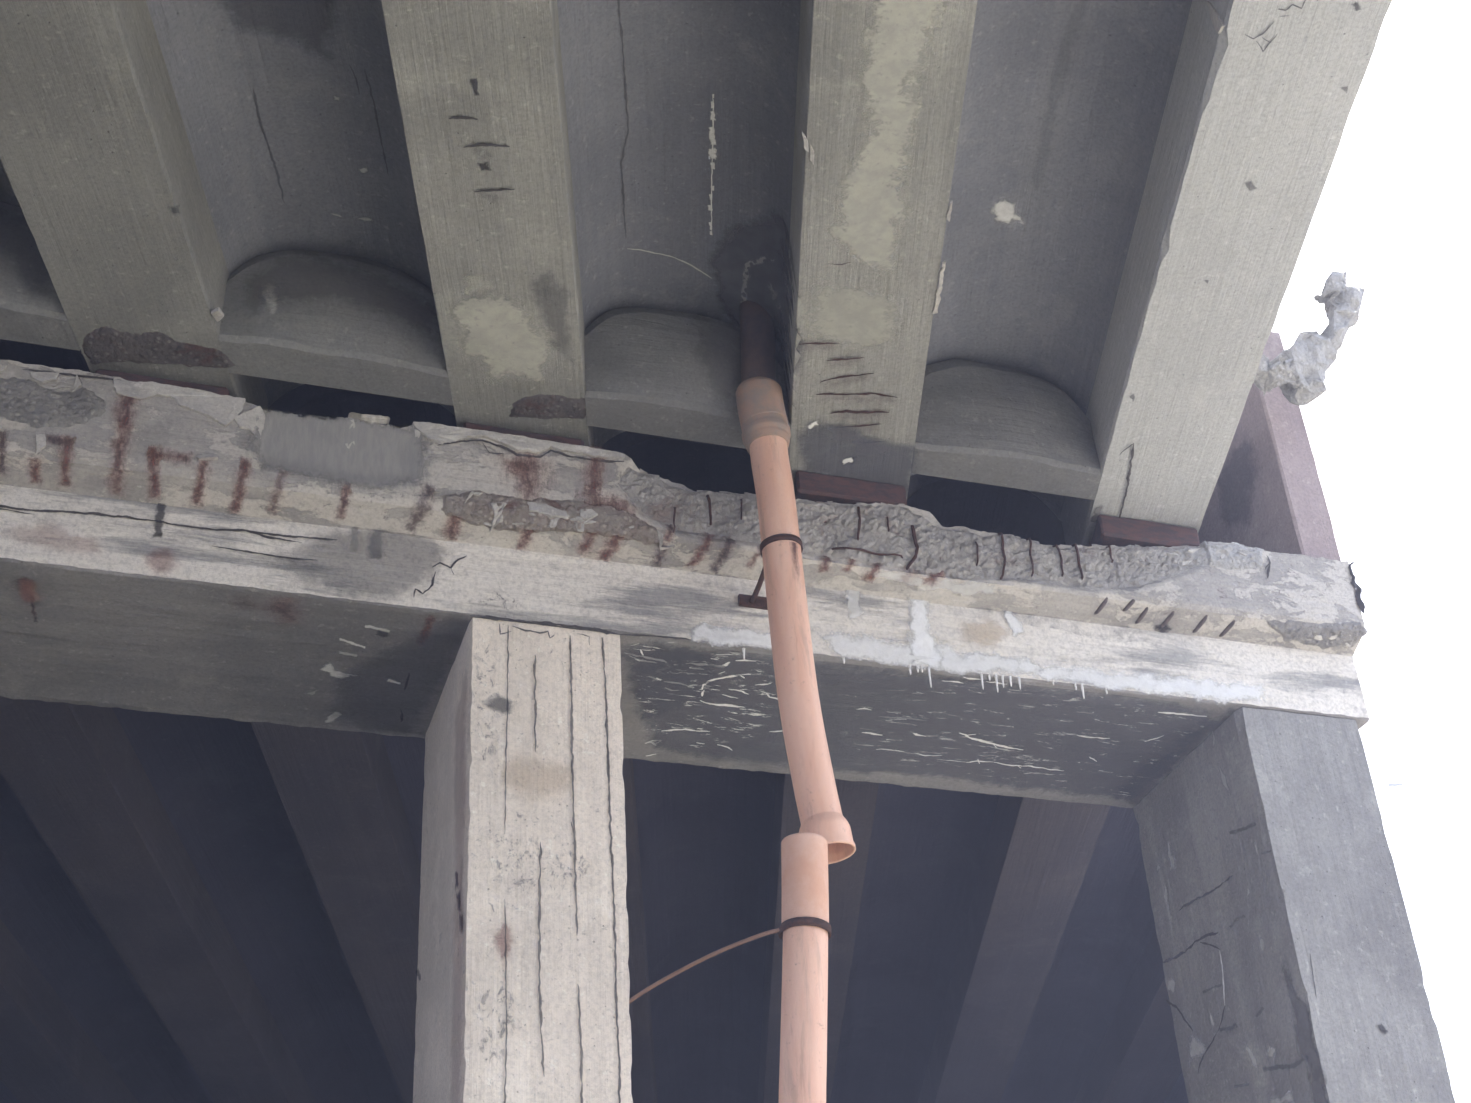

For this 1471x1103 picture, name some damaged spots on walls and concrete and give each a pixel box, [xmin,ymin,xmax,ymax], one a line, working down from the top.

leakage [828,0,946,272]
leakage [708,94,897,405]
corrosion [108,395,134,494]
crack [0,505,337,560]
corrosion [147,447,210,505]
corrosion [230,459,250,512]
peeling [0,326,761,551]
crack [799,342,897,442]
spalling [796,499,1264,624]
leakage [626,623,788,762]
leakage [814,599,1264,804]
crack [470,615,783,1103]